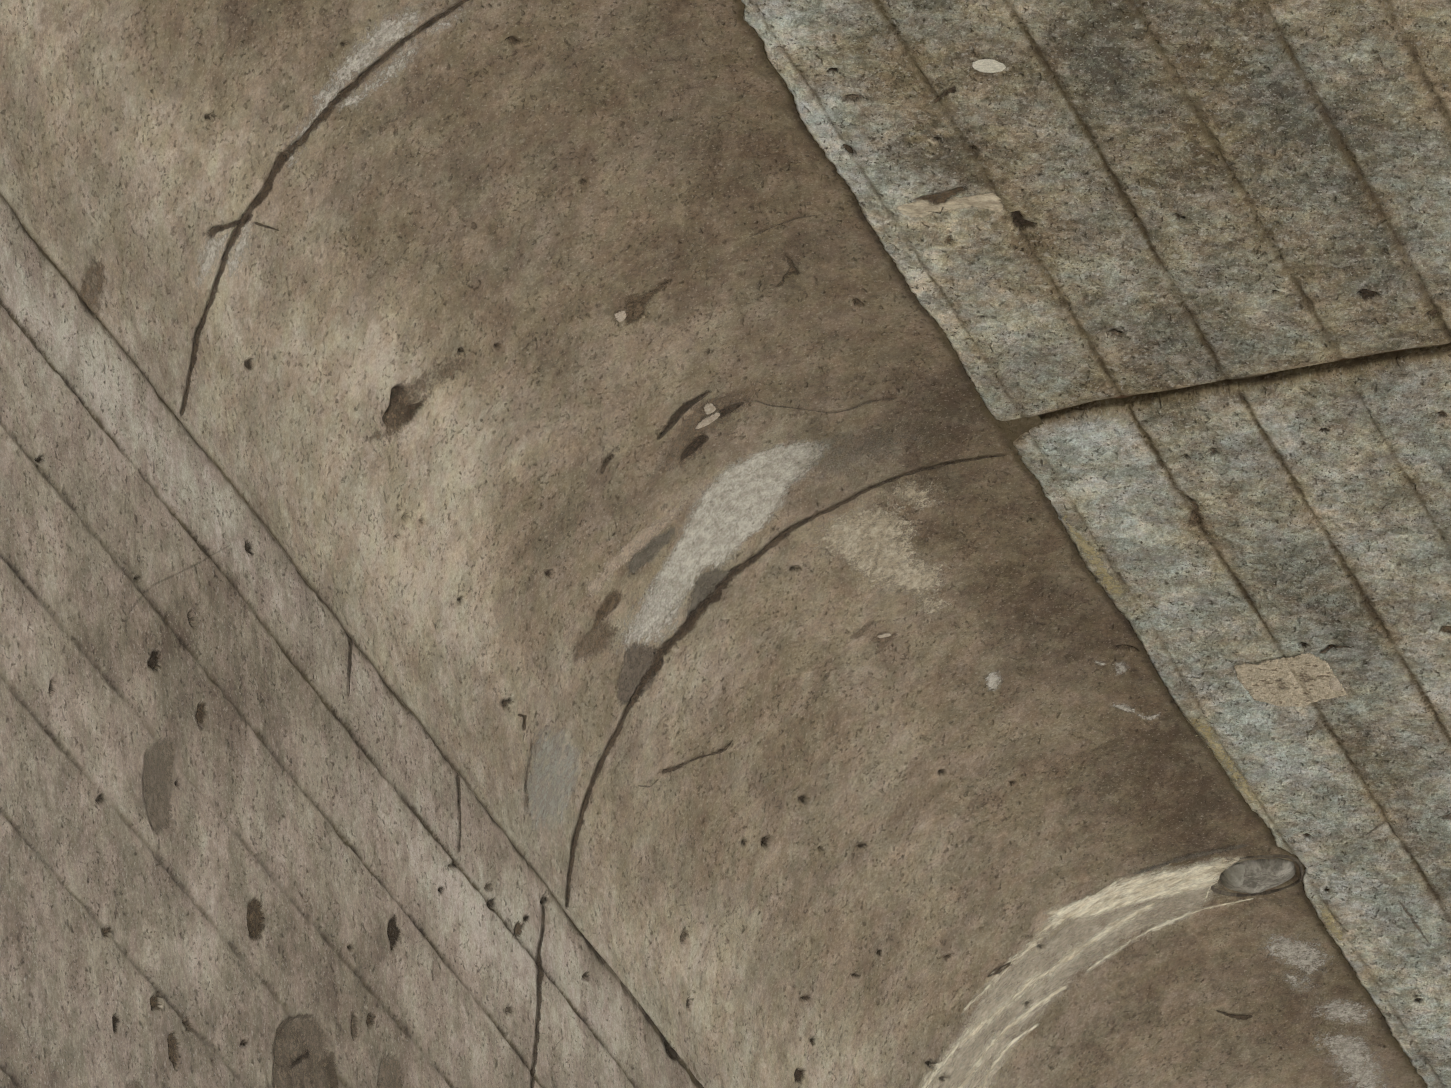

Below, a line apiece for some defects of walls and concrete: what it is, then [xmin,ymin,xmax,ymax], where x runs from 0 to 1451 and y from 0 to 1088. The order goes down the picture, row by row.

crack [181,0,469,416]
leakage [574,442,829,705]
crack [530,454,1005,1088]
leakage [923,845,1251,1088]